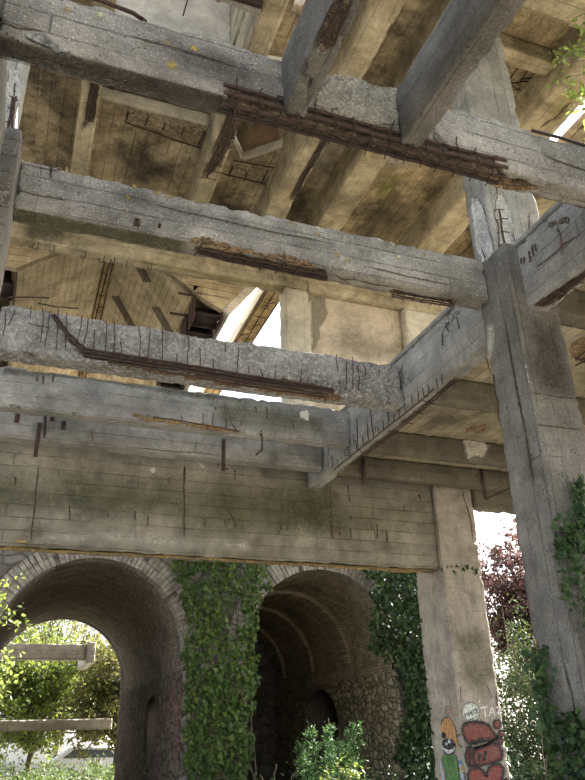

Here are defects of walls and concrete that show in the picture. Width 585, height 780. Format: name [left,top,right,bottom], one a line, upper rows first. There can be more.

spalling [317,0,353,52]
spalling [507,65,534,98]
spalling [199,74,542,262]
spalling [190,236,328,281]
spalling [535,270,585,307]
spalling [8,262,366,402]
spalling [569,338,585,366]
spalling [132,413,240,433]